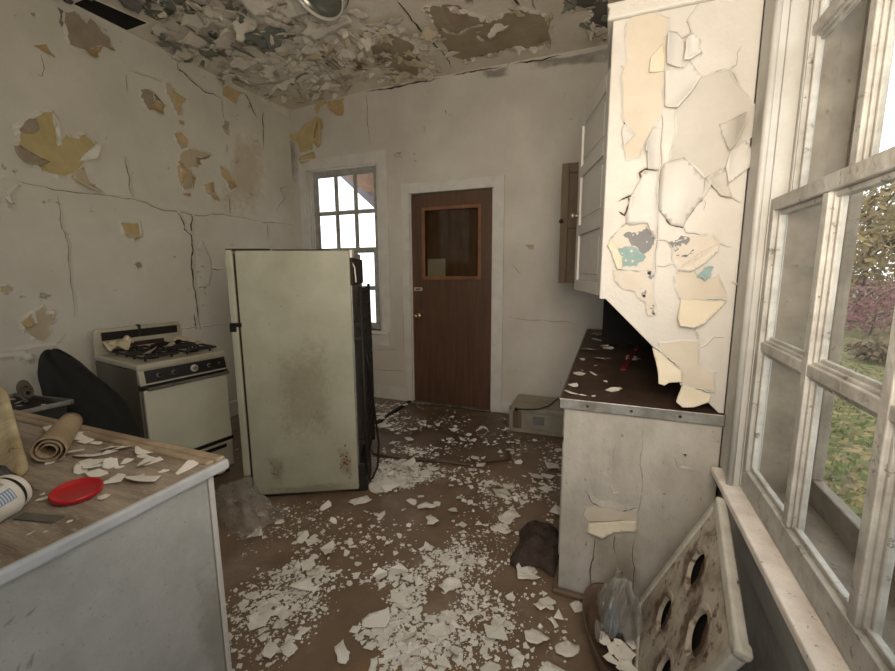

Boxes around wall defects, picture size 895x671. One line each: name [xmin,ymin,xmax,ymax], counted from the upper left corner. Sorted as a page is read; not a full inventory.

peeling [9,107,105,193]
peeling [57,0,116,57]
peeling [119,220,144,243]
crack [3,156,295,329]
peeling [138,80,238,204]
peeling [118,0,613,164]
crack [366,0,561,140]
peeling [608,12,755,328]
peeling [0,304,58,364]
peeling [652,339,716,408]
peeling [587,521,637,539]
crack [585,417,644,594]